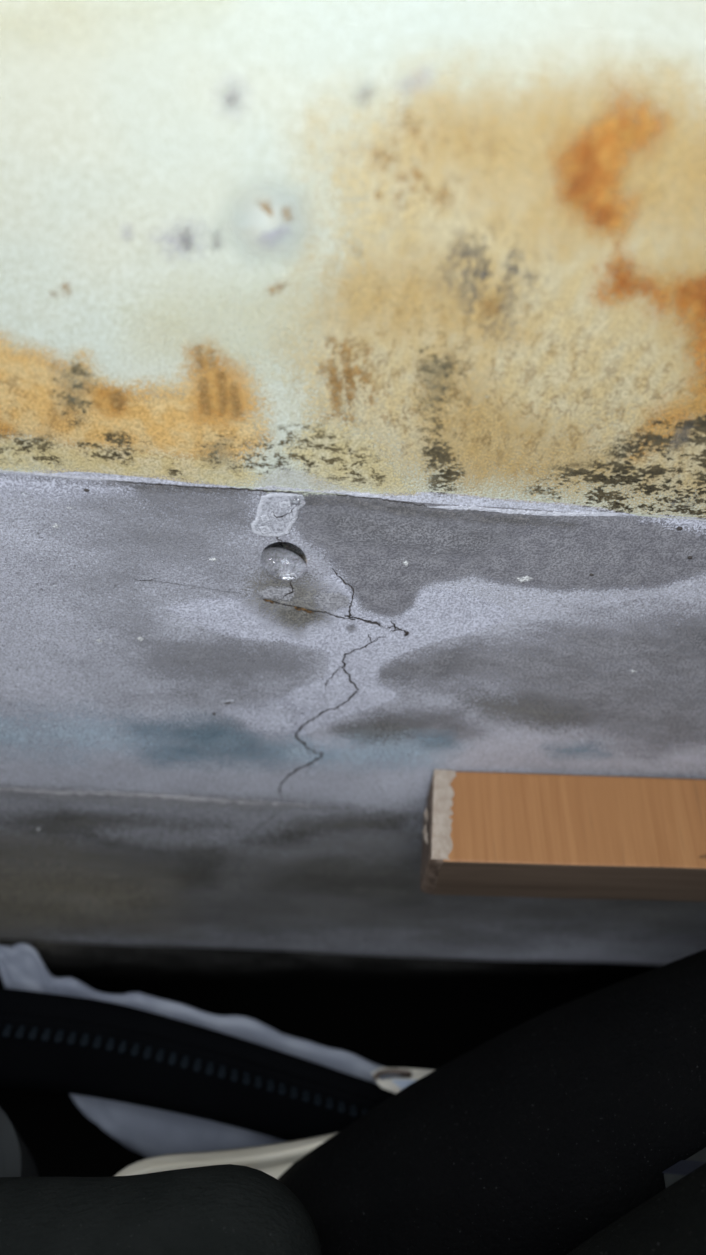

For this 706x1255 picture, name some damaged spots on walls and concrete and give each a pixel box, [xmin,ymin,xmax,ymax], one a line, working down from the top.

corrosion [319,338,380,421]
leakage [0,56,706,769]
corrosion [592,250,706,459]
crack [135,568,409,802]